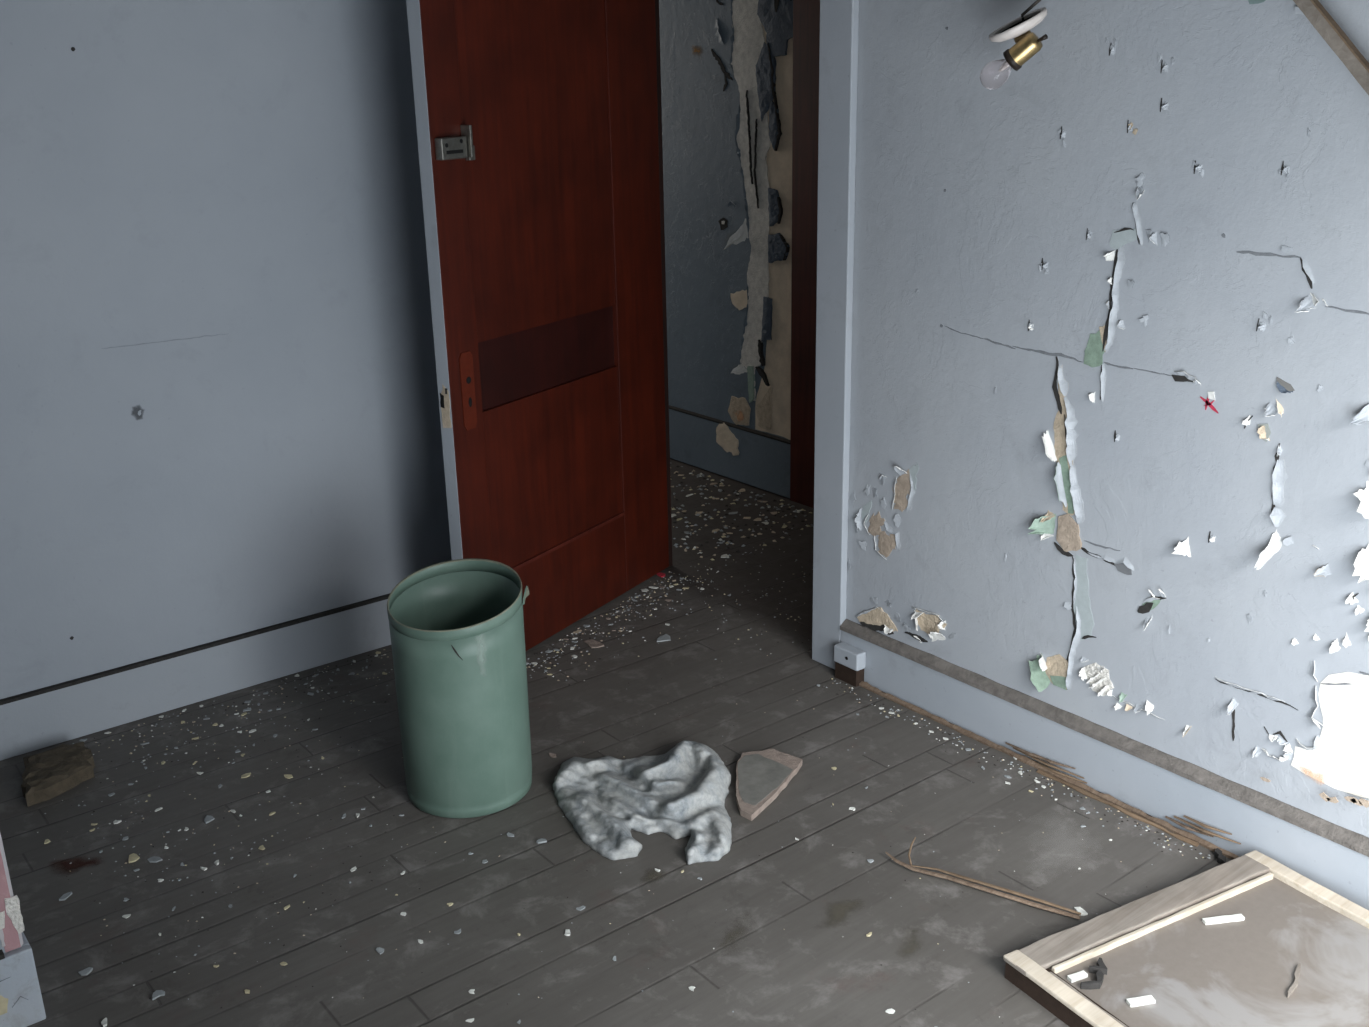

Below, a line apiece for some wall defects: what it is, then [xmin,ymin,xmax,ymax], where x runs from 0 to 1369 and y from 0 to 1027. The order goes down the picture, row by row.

peeling [716,0,793,456]
peeling [1083,172,1170,403]
crack [1237,245,1369,315]
crack [946,326,1171,376]
peeling [1028,356,1085,557]
peeling [1242,377,1295,570]
peeling [1354,459,1369,519]
peeling [1171,536,1191,557]
peeling [855,596,956,643]
peeling [1137,589,1166,631]
peeling [1029,652,1164,721]
spalling [1252,544,1369,808]